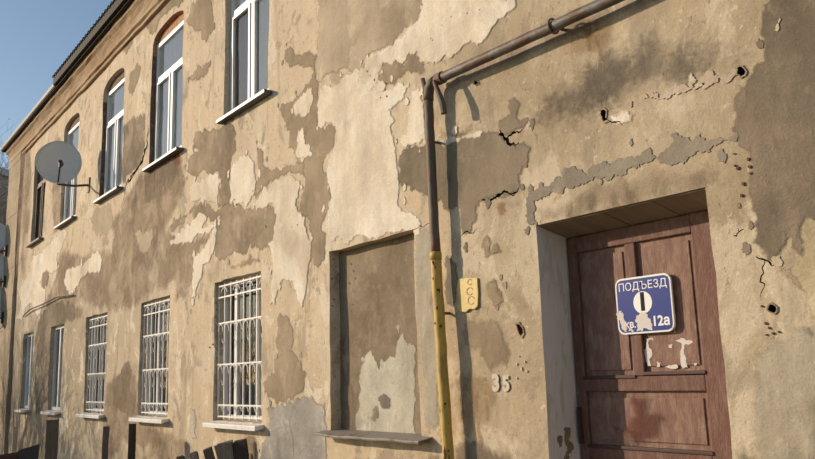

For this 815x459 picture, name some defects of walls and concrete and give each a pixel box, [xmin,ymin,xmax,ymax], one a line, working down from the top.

crack [499,128,524,146]
crack [122,128,149,203]
flaking render [170,0,815,434]
crack [482,189,519,201]
peeling [135,228,153,254]
crack [756,256,774,301]
peeling [557,427,574,459]
peeling [614,399,657,446]